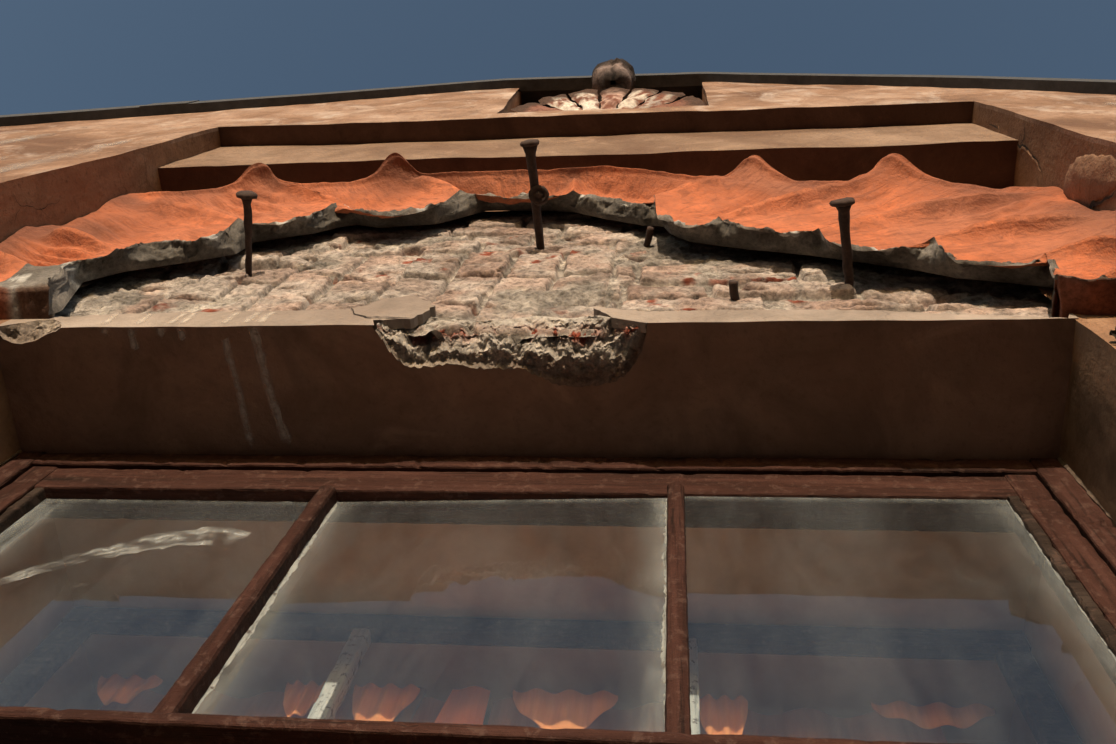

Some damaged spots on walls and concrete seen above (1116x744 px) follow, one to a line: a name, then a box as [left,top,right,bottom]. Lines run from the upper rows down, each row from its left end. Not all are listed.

spalling [0,190,1116,344]
spalling [350,307,646,387]